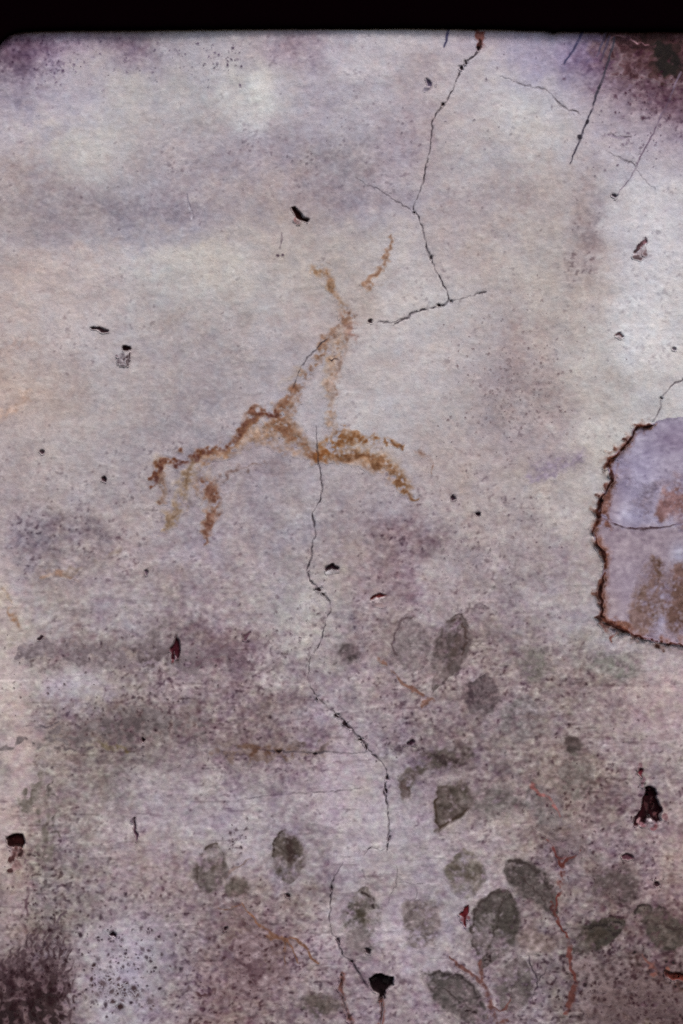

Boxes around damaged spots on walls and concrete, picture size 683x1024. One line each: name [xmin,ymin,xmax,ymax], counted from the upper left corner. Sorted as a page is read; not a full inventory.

rust [144,259,435,547]
crack [292,338,328,389]
rust [360,233,396,293]
crack [355,45,487,326]
damp [561,31,683,200]
crack [606,132,656,190]
peeling [588,417,683,653]
crack [240,425,440,1024]
damp [0,761,330,1024]